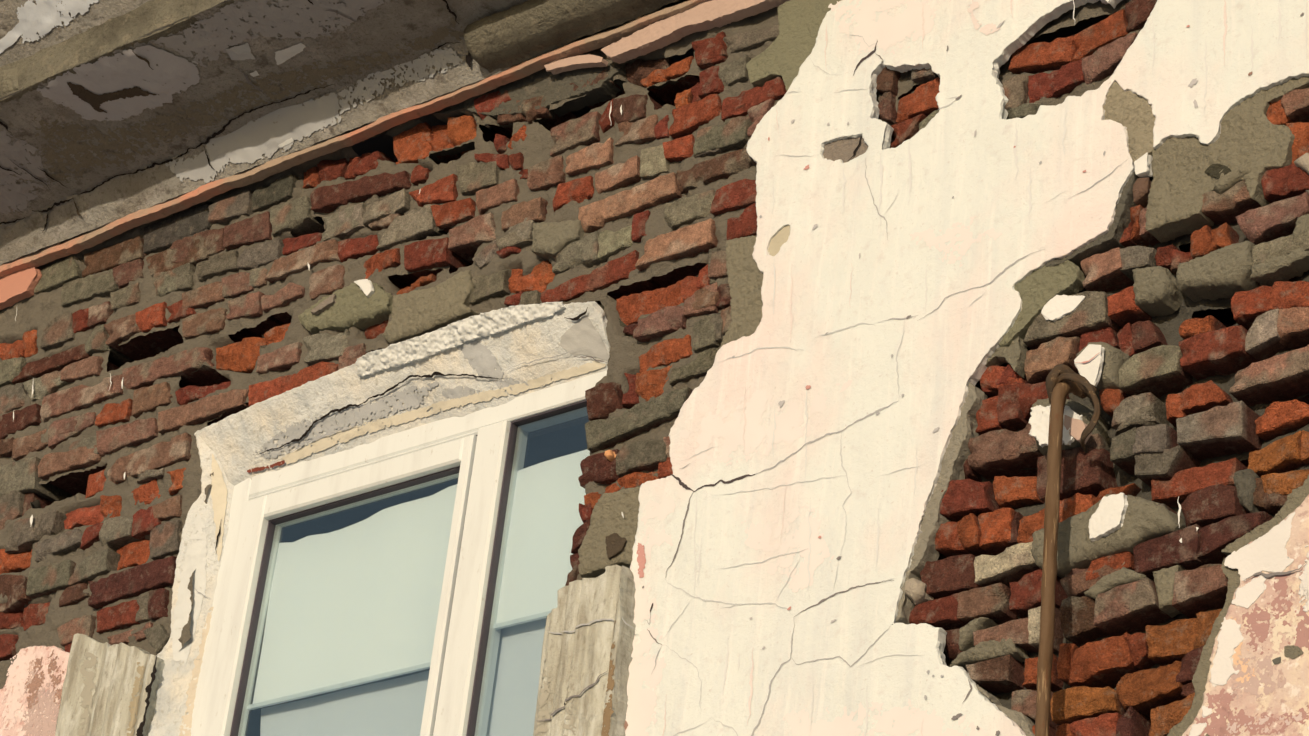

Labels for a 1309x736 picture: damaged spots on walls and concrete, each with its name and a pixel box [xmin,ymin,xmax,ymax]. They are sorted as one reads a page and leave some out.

crack [0,84,333,231]
crack [784,34,883,95]
crack [783,136,897,239]
flaking render [823,137,868,163]
flaking render [876,66,940,148]
crack [1049,161,1125,201]
flaking render [0,0,841,736]
crack [256,307,608,455]
flaking render [895,0,1309,736]
crack [540,249,1044,736]
crack [1245,561,1307,580]
crack [136,655,157,736]